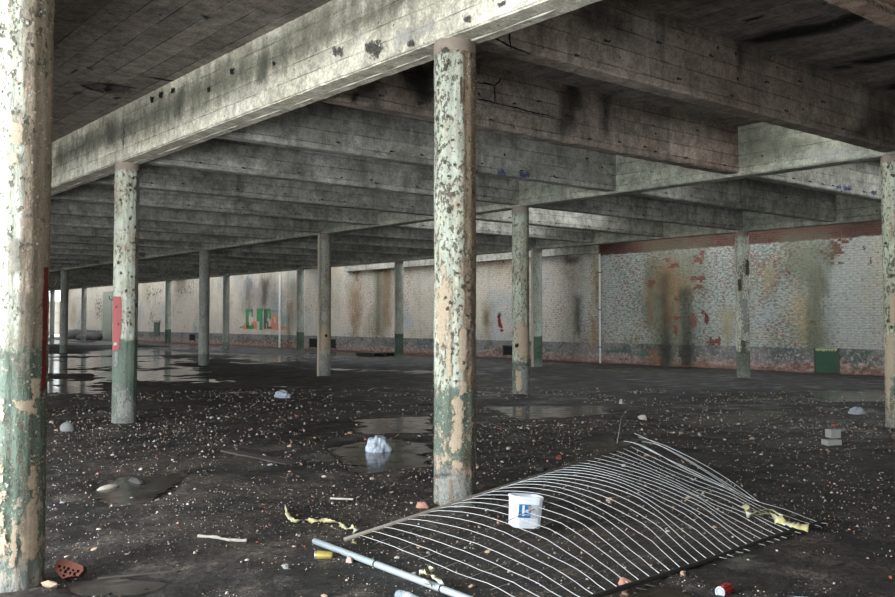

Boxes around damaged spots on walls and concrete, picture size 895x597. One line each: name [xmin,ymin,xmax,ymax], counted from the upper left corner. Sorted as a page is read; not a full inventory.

spalling [364,40,383,60]
crack [478,77,552,117]
peeling [0,0,56,568]
peeling [433,47,504,470]
peeling [690,250,706,290]
peeling [820,234,852,265]
water stain [650,254,692,357]
peeling [673,310,721,347]
peeling [843,268,895,415]